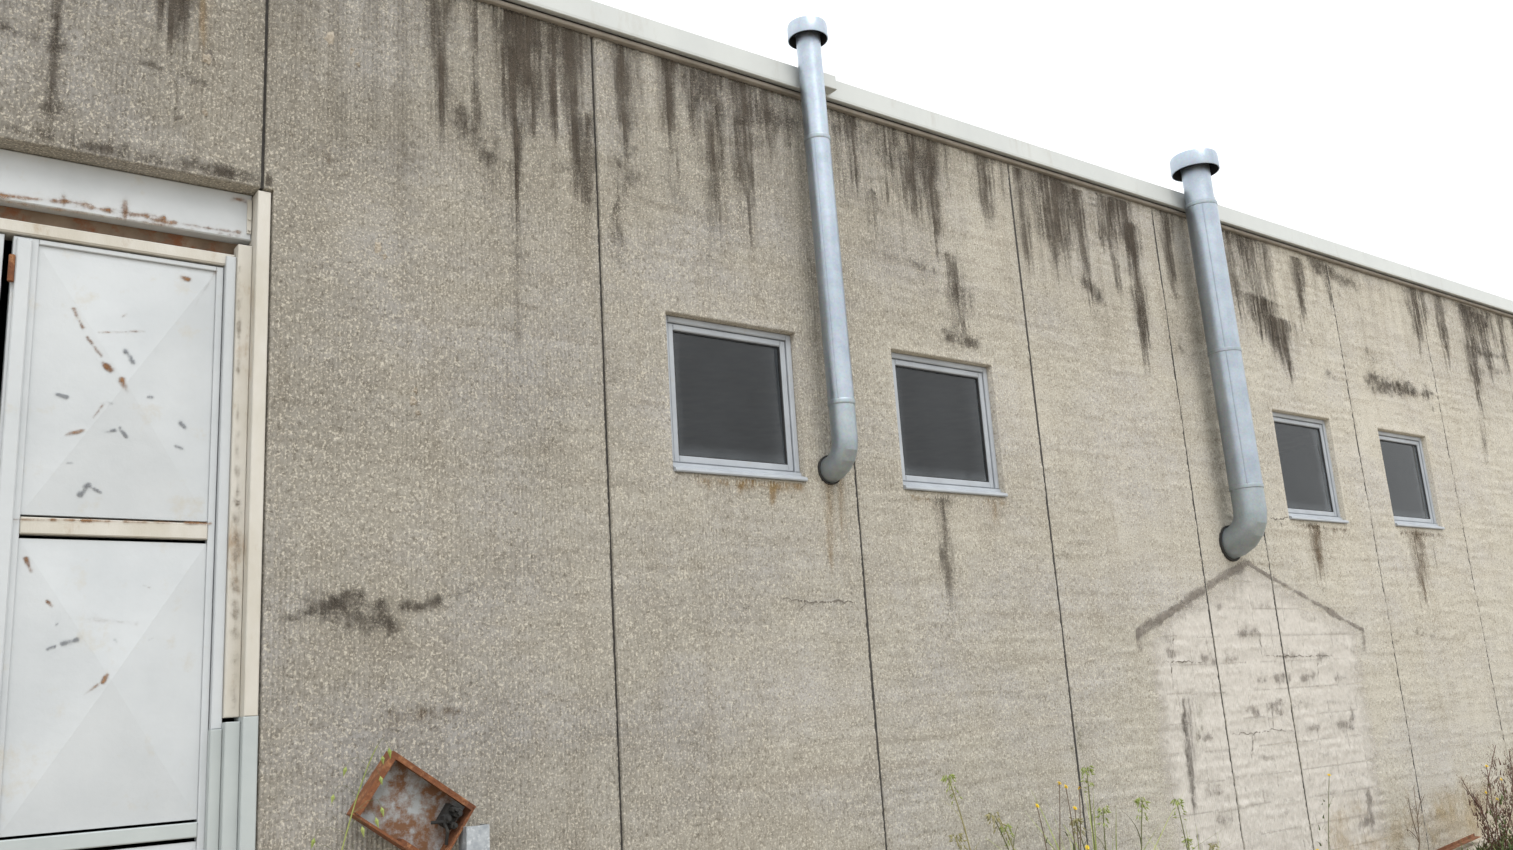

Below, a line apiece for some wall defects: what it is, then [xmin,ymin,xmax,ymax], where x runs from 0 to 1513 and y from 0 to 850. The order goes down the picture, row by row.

rust [90,205,176,225]
water stain [158,0,189,46]
water stain [430,0,467,128]
water stain [474,8,591,200]
water stain [614,44,629,142]
water stain [661,58,788,240]
water stain [877,125,940,241]
water stain [1014,168,1149,352]
water stain [1222,231,1349,378]
water stain [1368,374,1429,395]
water stain [1410,288,1513,406]
water stain [312,591,441,631]